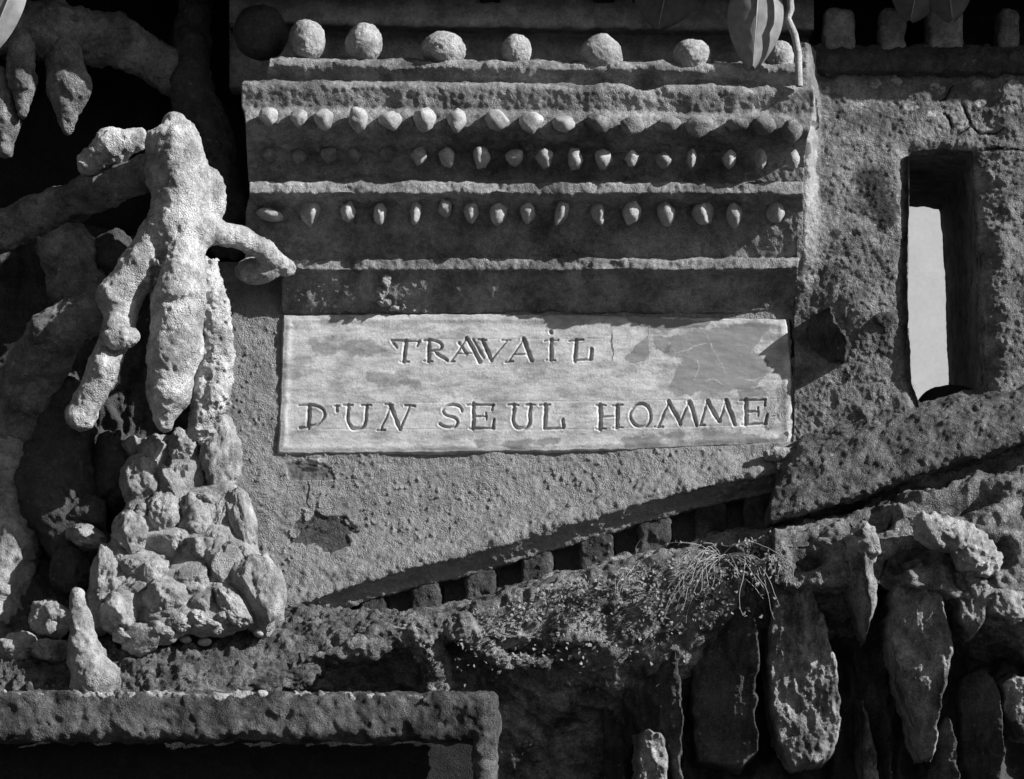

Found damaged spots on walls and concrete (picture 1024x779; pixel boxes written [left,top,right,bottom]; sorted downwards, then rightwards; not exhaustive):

spalling [290,508,365,552]